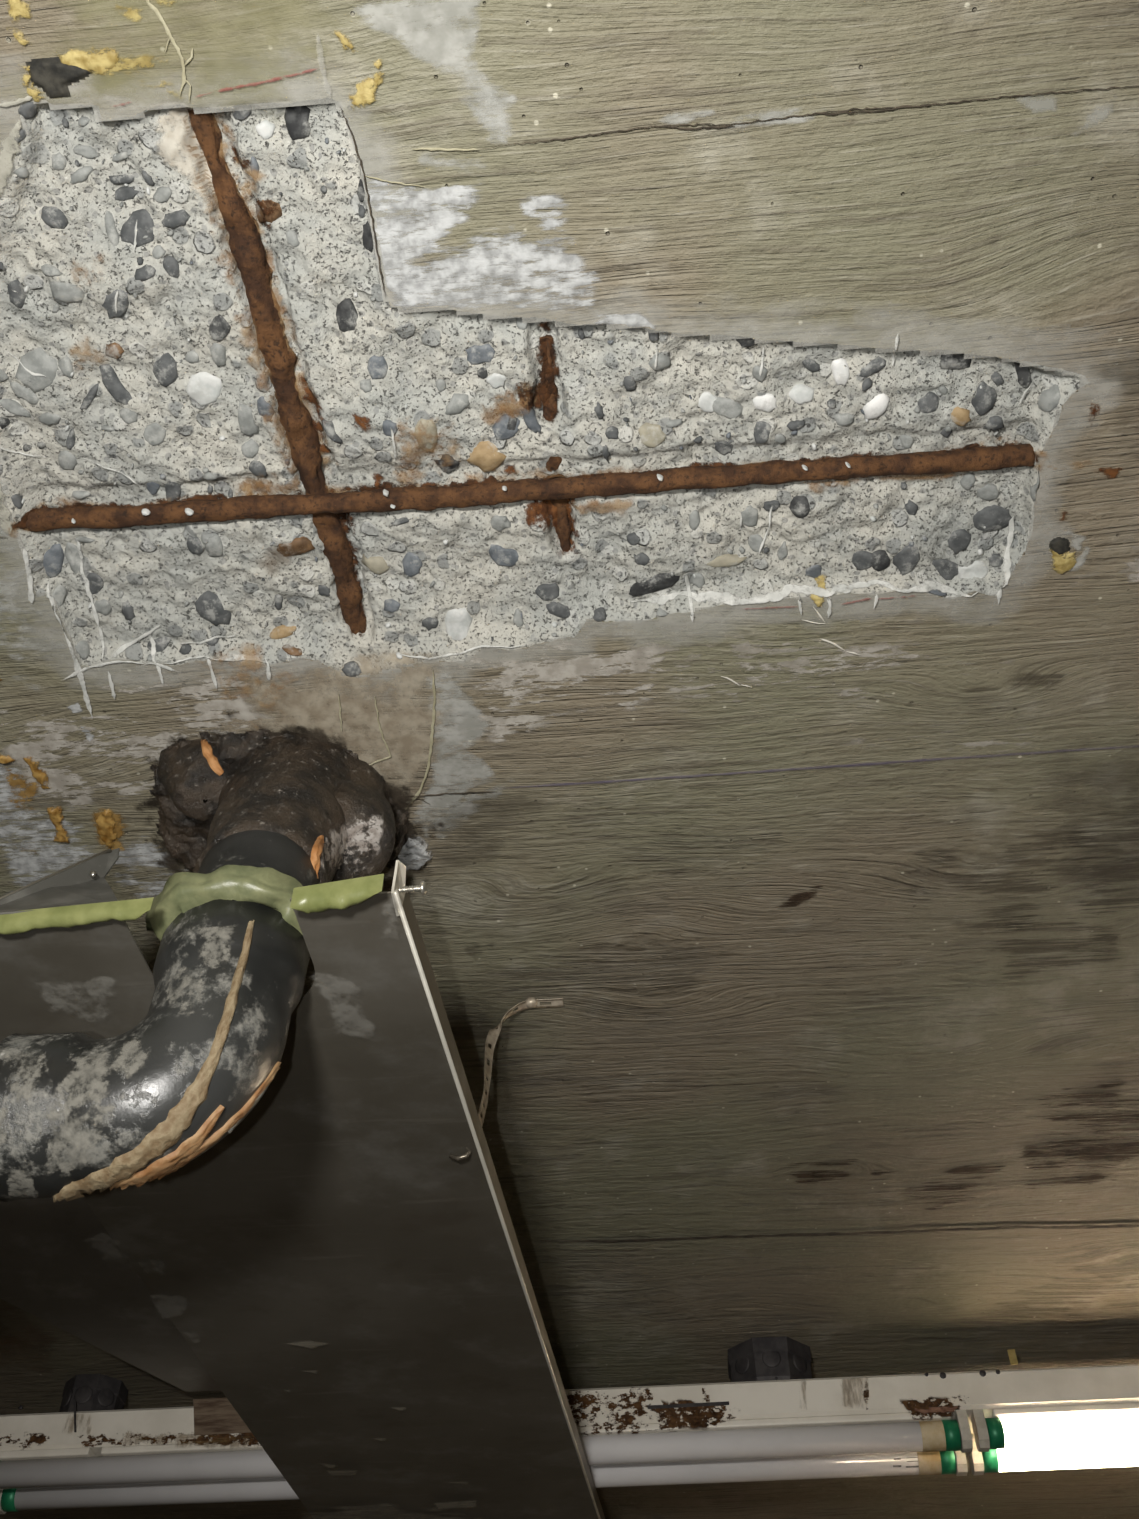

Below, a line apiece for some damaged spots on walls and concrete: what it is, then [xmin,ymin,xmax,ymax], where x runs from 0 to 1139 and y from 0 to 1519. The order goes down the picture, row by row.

damp [369,180,654,330]
rust [11,105,1045,637]
spalling [0,57,1090,808]
damp [225,654,501,872]